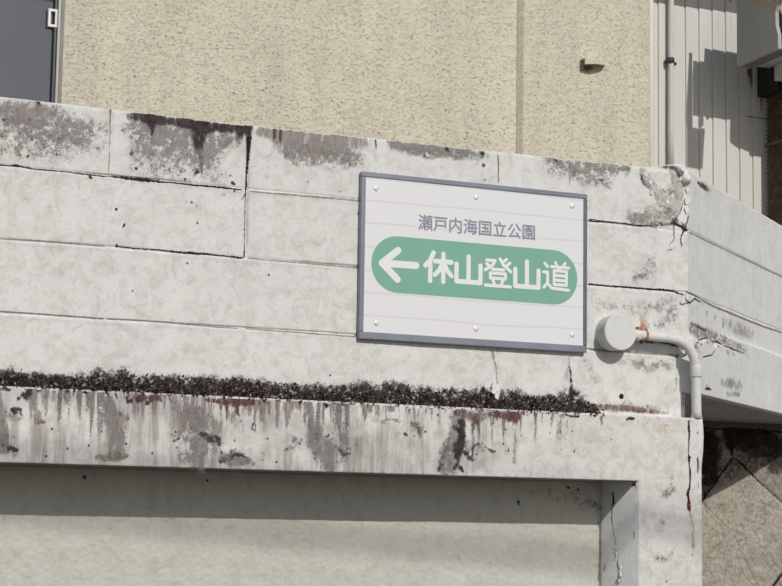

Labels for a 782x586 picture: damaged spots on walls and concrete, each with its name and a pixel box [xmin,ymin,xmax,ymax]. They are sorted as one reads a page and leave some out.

damp [0,100,111,160]
damp [121,113,247,181]
damp [387,140,488,167]
spalling [627,165,691,228]
crack [588,204,782,277]
crack [589,283,782,332]
crack [588,348,676,356]
crack [696,337,745,357]
damp [0,388,357,482]
damp [362,404,522,476]
crack [687,420,782,546]
damp [702,427,782,496]